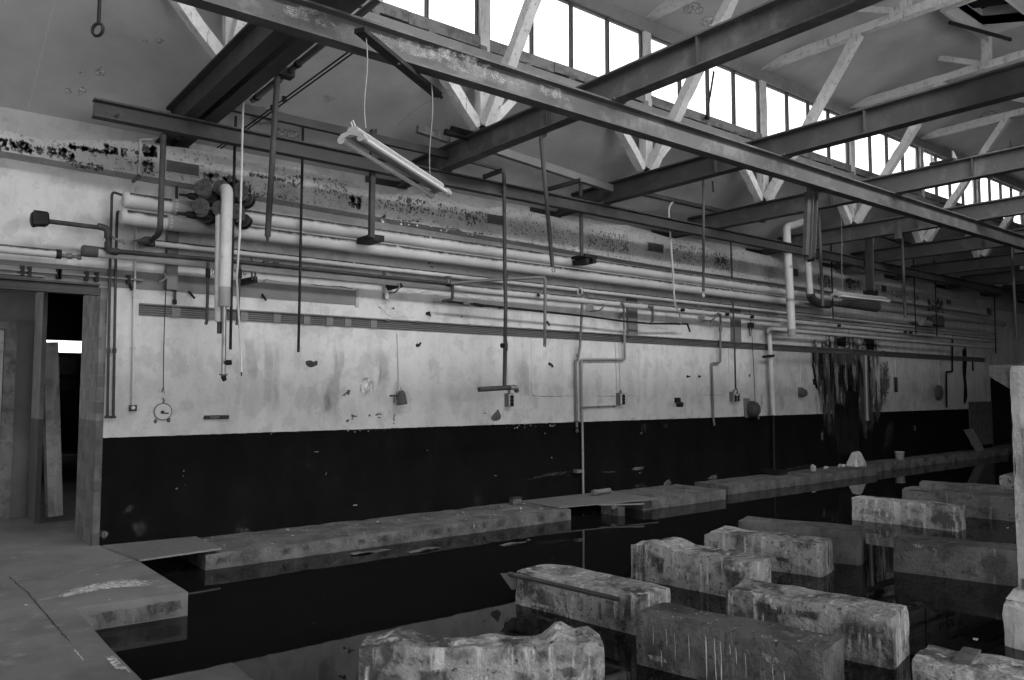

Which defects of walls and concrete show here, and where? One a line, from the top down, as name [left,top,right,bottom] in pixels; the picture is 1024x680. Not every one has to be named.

peeling [0,138,169,179]